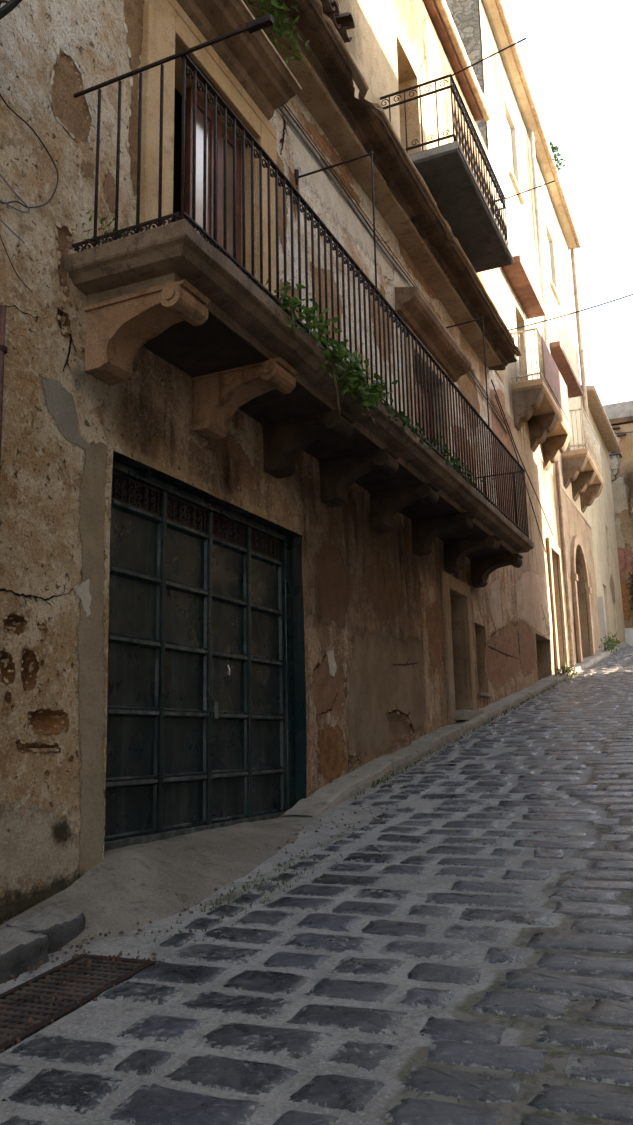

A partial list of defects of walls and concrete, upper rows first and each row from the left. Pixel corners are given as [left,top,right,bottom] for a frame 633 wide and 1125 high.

flaking render [49,48,92,144]
flaking render [123,0,144,196]
spalling [3,612,48,635]
crack [0,584,74,607]
spalling [0,648,44,702]
flaking render [485,619,537,694]
spalling [16,705,74,762]
flaking render [309,644,362,784]
crack [386,704,415,733]